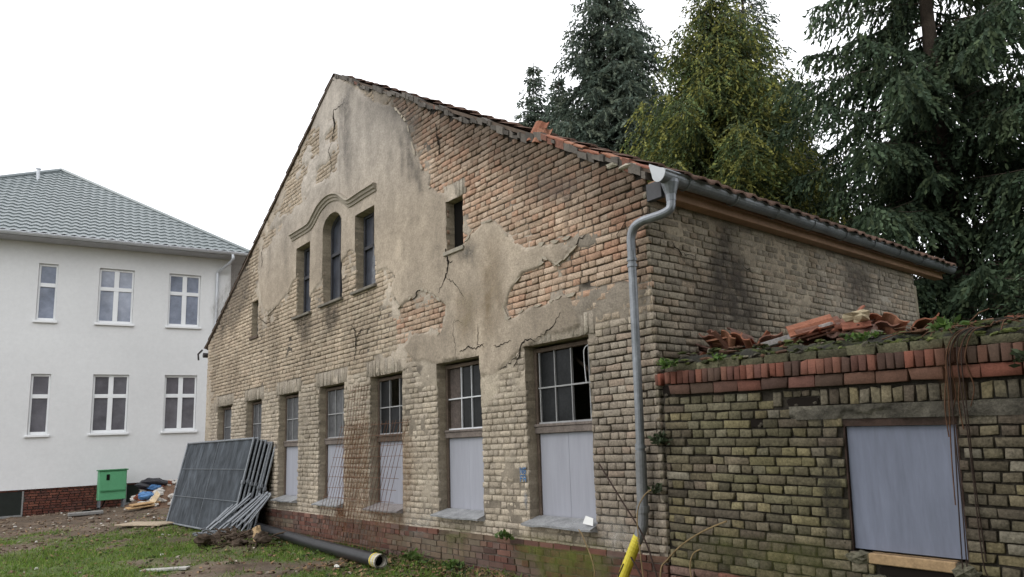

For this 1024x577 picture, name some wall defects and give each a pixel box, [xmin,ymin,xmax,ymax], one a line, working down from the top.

crack [412,248,561,370]
flaking render [394,101,654,321]